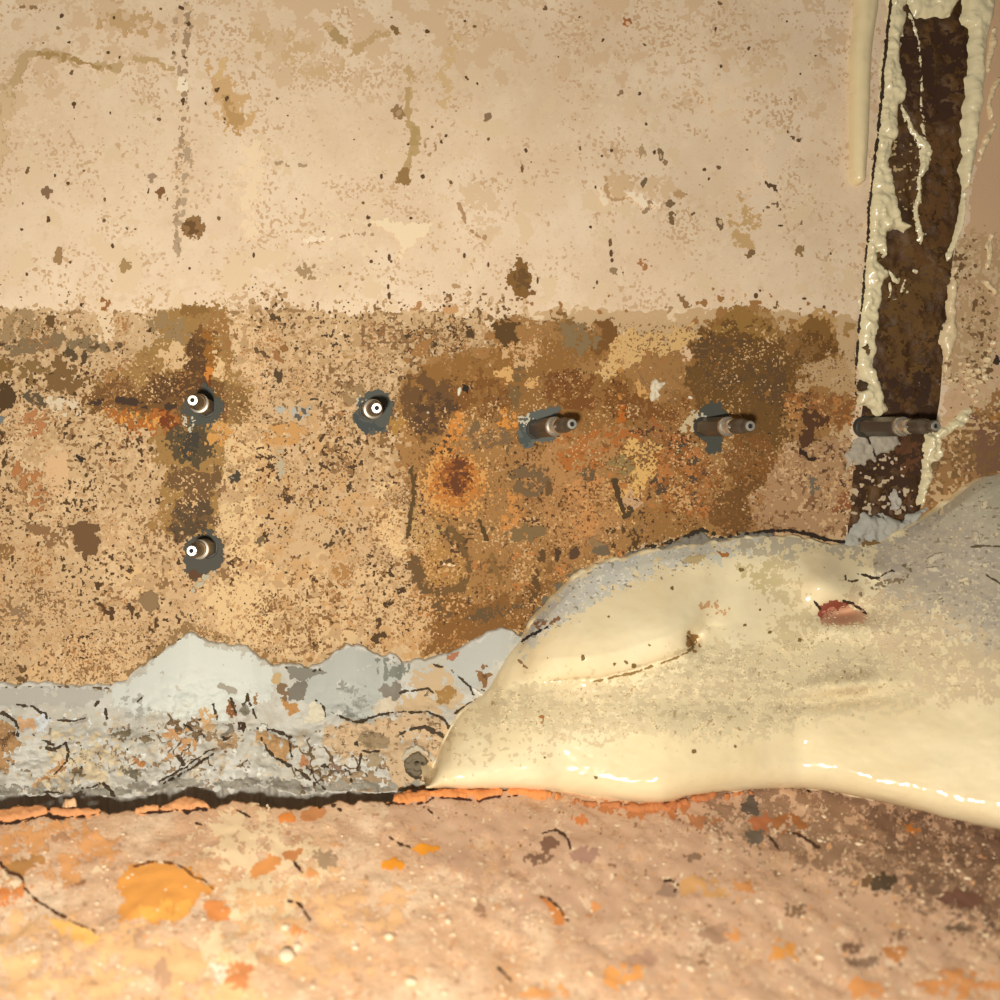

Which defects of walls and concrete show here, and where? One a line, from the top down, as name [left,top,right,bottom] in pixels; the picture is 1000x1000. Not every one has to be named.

rust [879,131,961,387]
damp [0,308,125,413]
damp [26,521,101,559]
rust [79,300,257,539]
damp [161,423,223,547]
damp [490,315,521,347]
damp [366,501,652,656]
damp [551,312,620,366]
rust [392,302,861,659]
damp [797,407,830,461]
rust [920,389,1000,516]
damp [123,621,313,677]